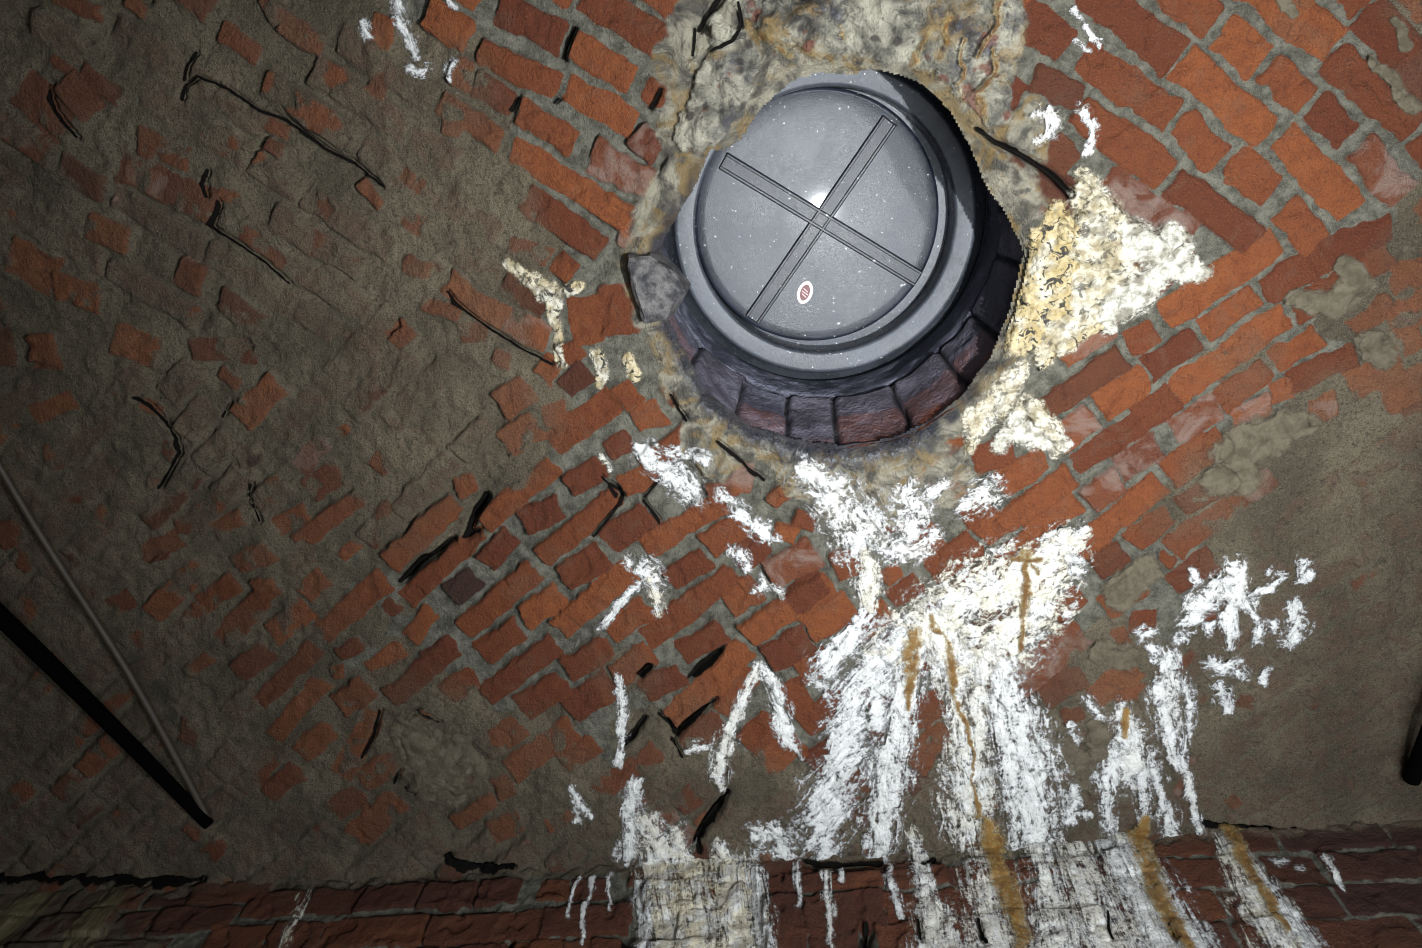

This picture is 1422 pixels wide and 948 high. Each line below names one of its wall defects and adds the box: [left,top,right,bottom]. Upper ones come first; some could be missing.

crack [181,52,384,187]
crack [697,0,743,52]
spalling [674,0,1030,153]
leakage [1069,6,1102,53]
leakage [502,257,585,370]
spalling [627,252,691,324]
leakage [962,101,1214,459]
leakage [565,321,1328,948]
corrosion [1011,549,1043,653]
corrosion [902,614,1033,948]
flaking render [1046,718,1112,777]
corrosion [1127,815,1196,948]